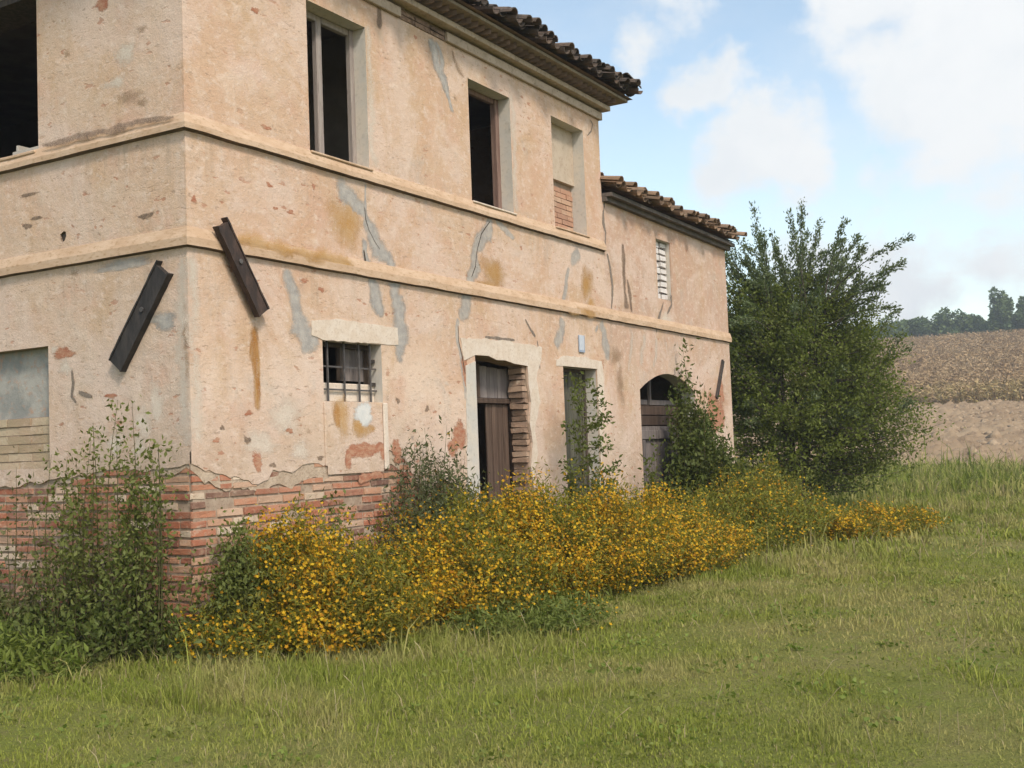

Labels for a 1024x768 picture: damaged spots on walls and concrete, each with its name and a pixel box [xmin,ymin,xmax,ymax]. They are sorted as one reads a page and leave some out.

water stain [41,90,174,148]
flaking render [0,380,458,648]
corrosion [249,327,261,409]
crack [335,175,410,364]
spalling [447,419,467,458]
crack [455,219,581,399]